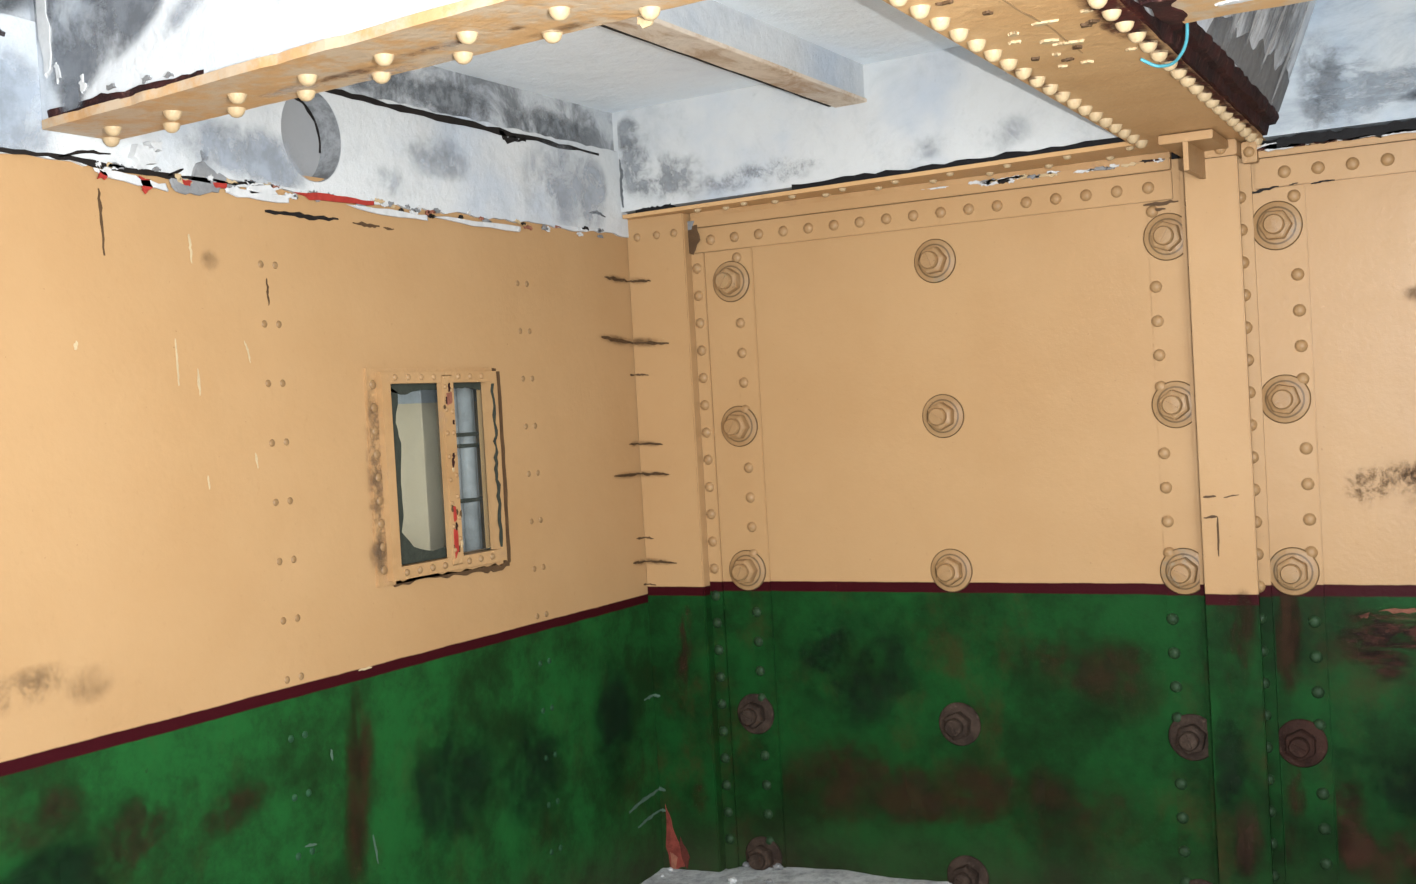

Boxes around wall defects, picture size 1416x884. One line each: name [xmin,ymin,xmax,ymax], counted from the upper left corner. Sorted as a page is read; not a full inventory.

rust [1085,0,1279,136]
water stain [1309,61,1416,116]
peeling [94,150,604,238]
crack [324,89,624,217]
water stain [548,162,605,219]
water stain [618,120,689,194]
crack [605,275,651,283]
crack [601,336,669,376]
crack [614,442,669,477]
water stain [1356,468,1416,496]
rust [1347,608,1416,678]
rust [348,722,370,867]